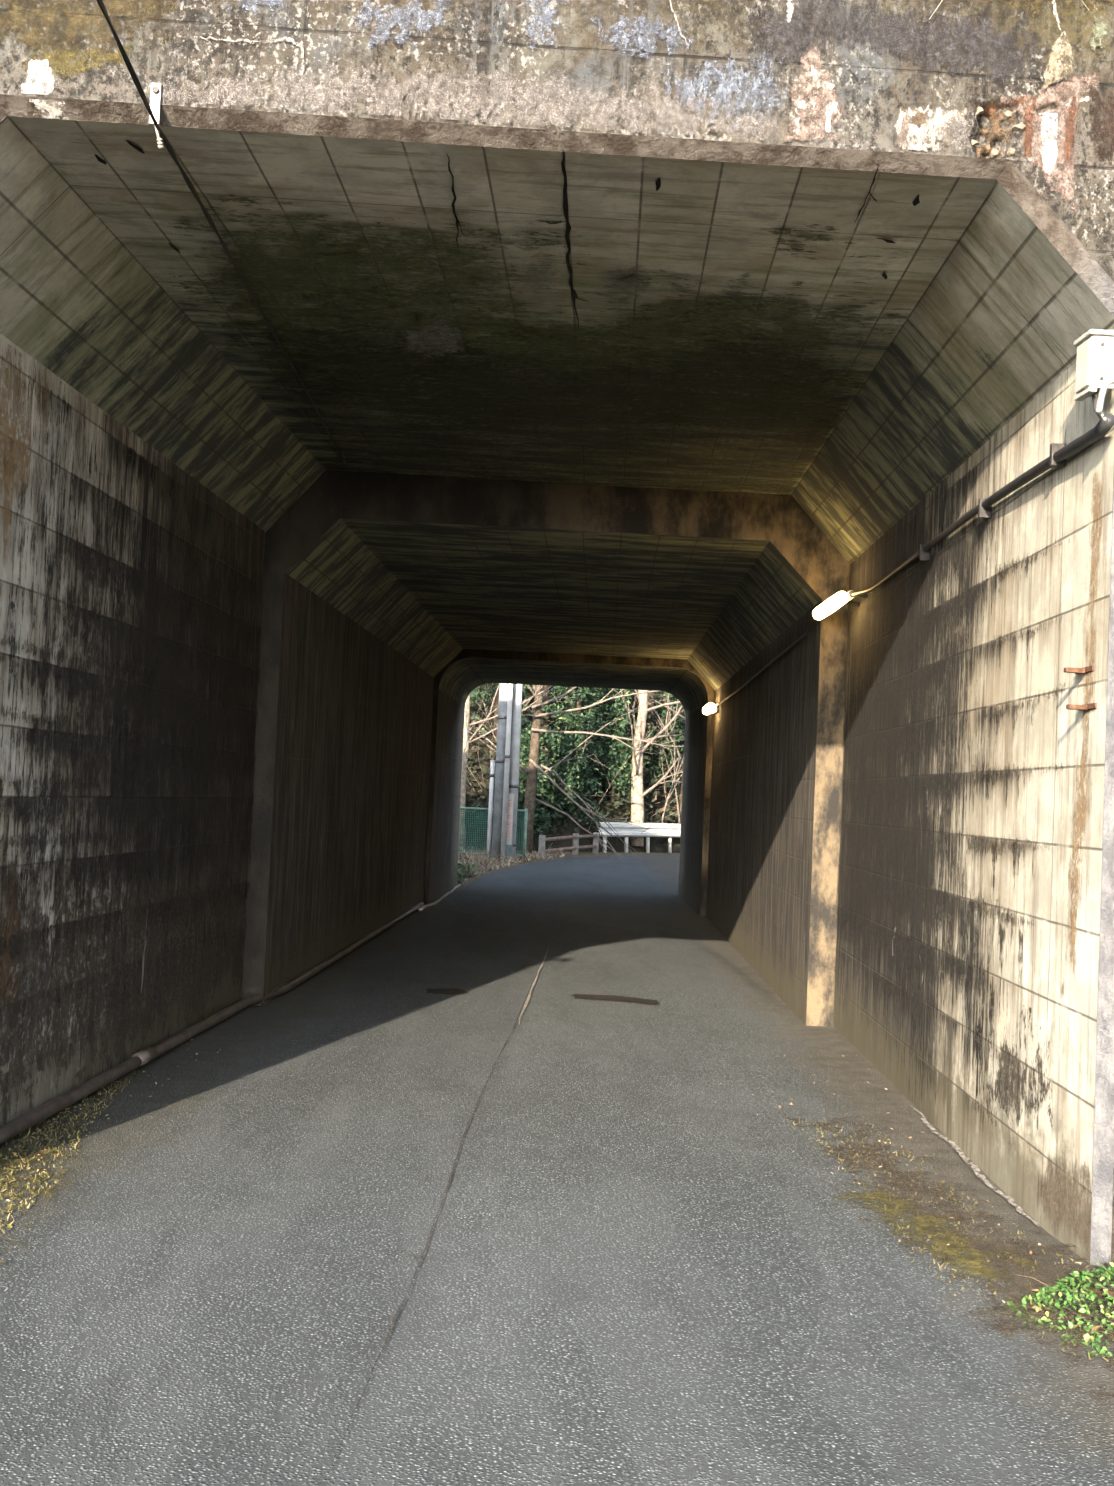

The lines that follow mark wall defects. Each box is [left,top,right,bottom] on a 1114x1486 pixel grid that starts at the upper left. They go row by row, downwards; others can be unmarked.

crack [446,153,464,247]
crack [545,150,588,328]
spalling [895,97,1091,159]
damp [0,350,267,1124]
damp [833,464,1070,1138]
damp [1037,1159,1091,1250]